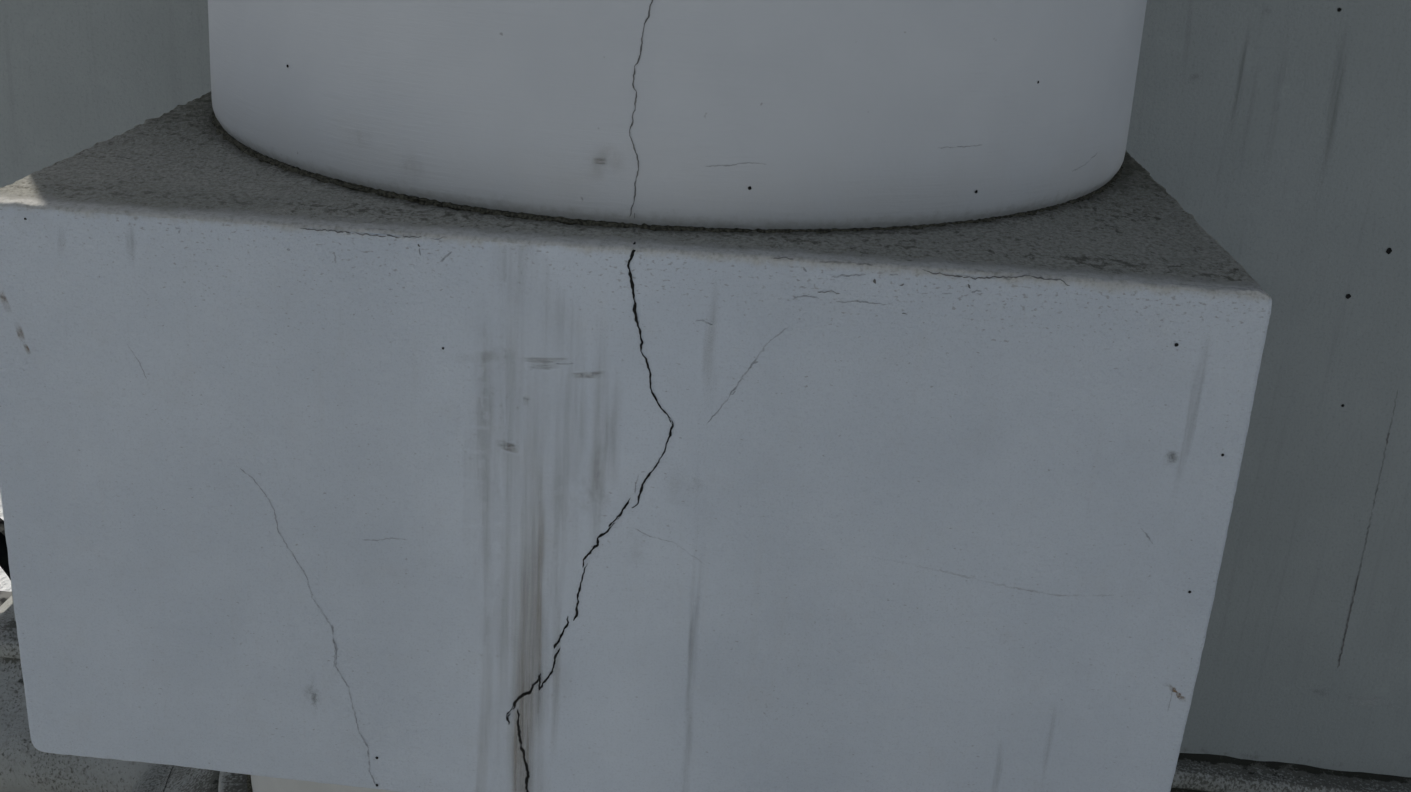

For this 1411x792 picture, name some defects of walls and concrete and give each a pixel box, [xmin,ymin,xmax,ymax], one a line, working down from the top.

crack [505,0,674,792]